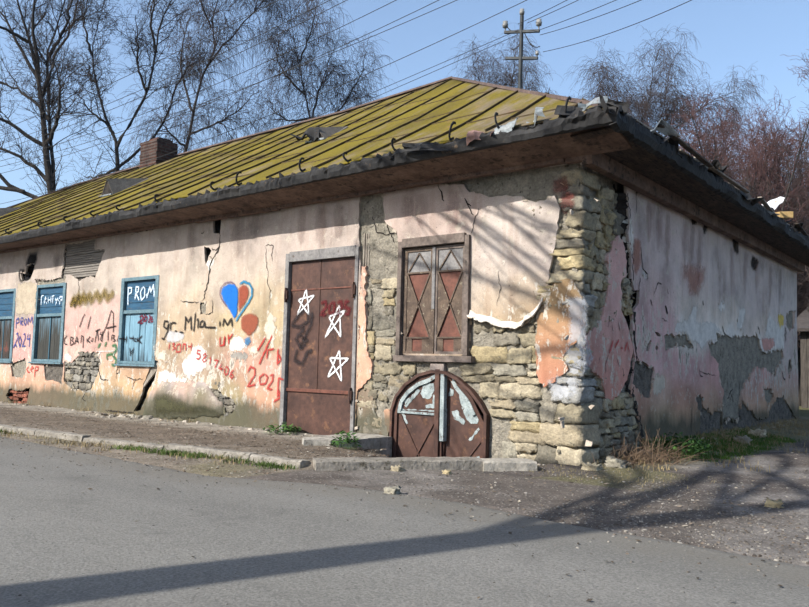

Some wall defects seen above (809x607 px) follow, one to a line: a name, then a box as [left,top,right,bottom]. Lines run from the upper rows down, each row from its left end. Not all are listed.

spalling [14,239,105,315]
crack [182,232,221,315]
spalling [354,163,665,466]
crack [599,184,669,441]
spalling [11,359,26,379]
spalling [9,388,30,404]
spalling [44,350,100,393]
spalling [644,306,796,435]